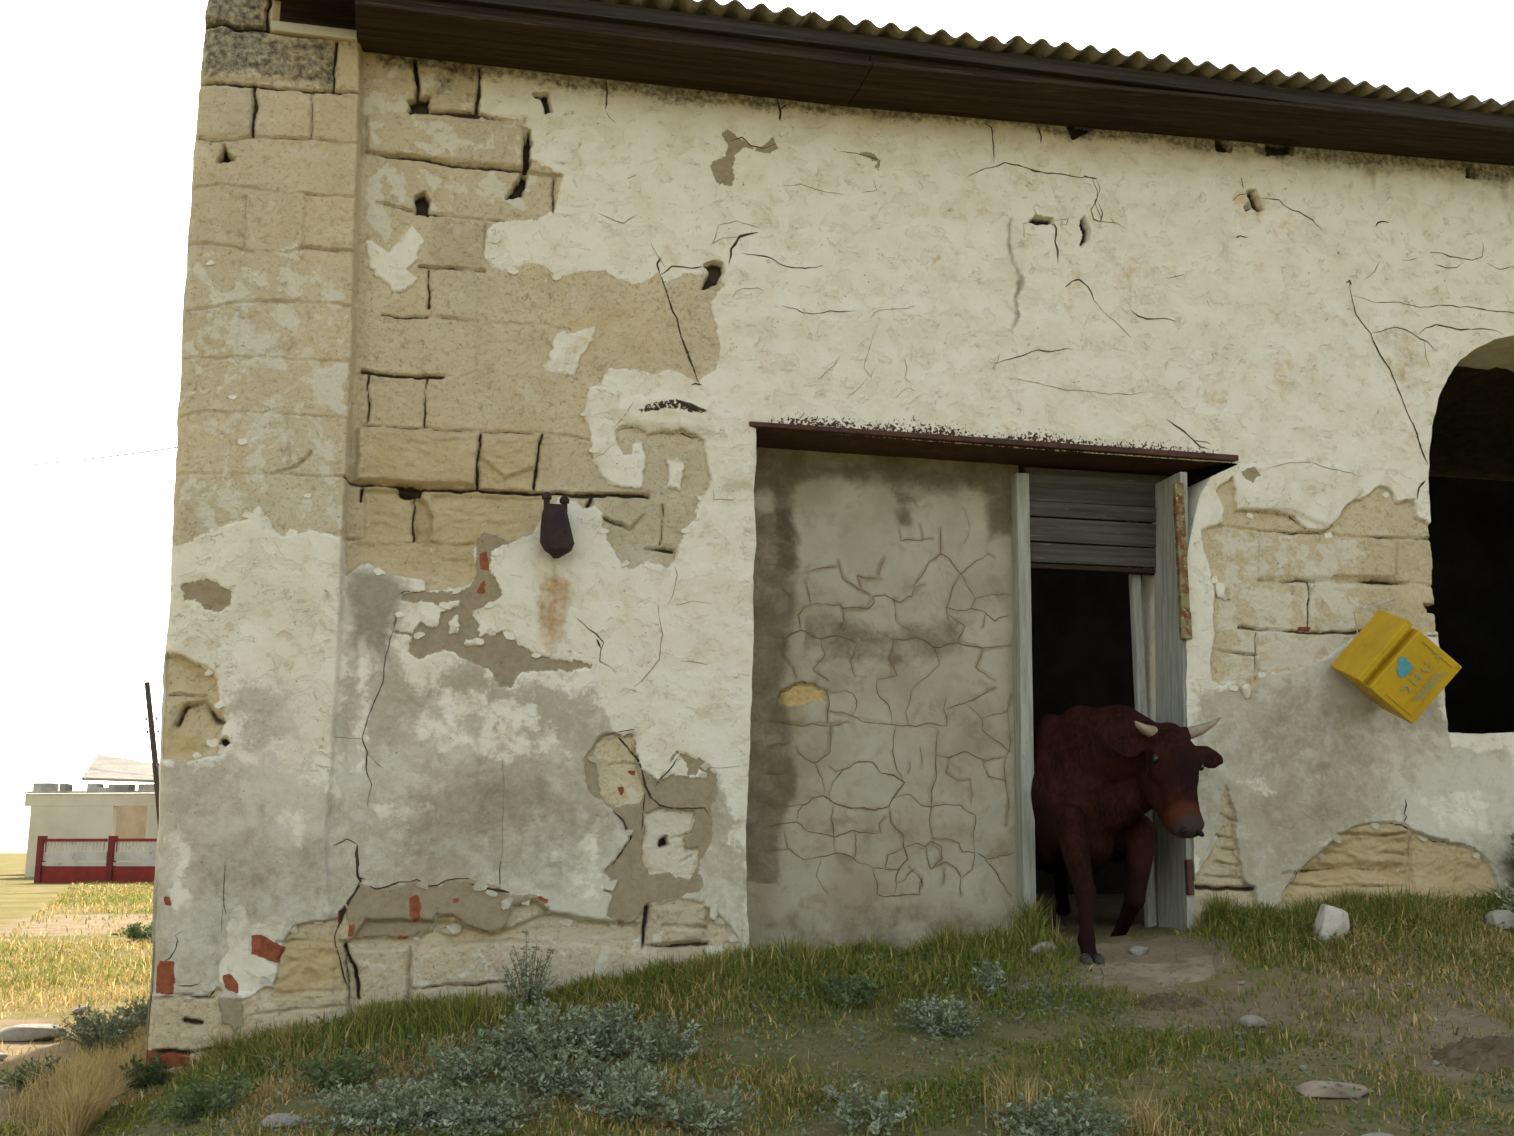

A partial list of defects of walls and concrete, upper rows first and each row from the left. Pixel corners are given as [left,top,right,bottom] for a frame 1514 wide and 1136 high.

spalling [172,0,725,693]
peeling [707,127,781,190]
crack [601,214,915,396]
crack [969,123,1177,333]
crack [1346,241,1513,499]
spalling [1199,463,1438,699]
spalling [161,647,228,766]
crack [606,497,1012,897]
crack [333,760,509,987]
spalling [146,727,743,1088]
spalling [1194,779,1262,930]
spalling [1279,818,1502,912]